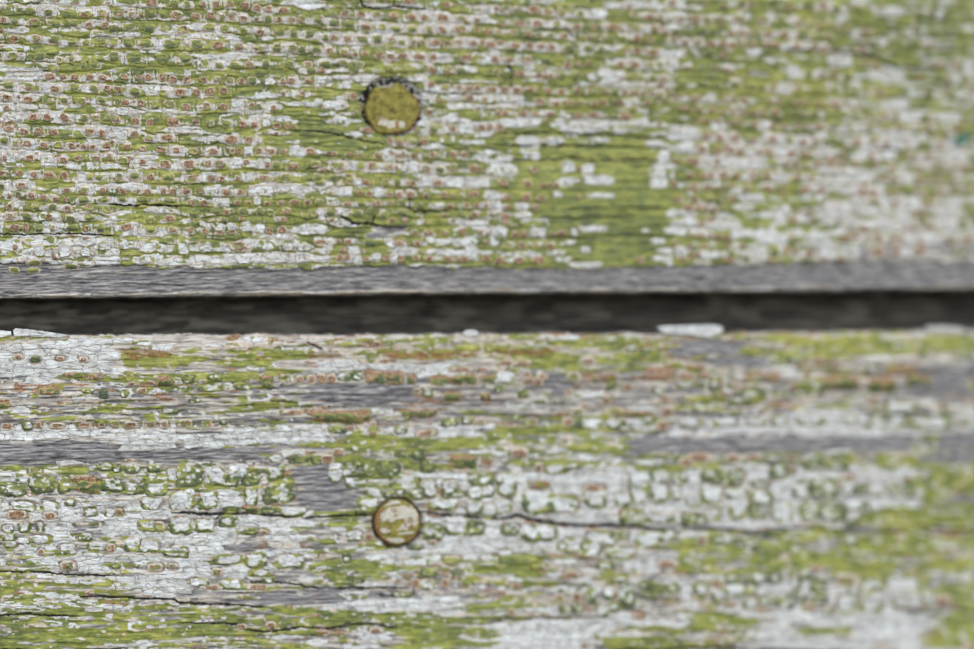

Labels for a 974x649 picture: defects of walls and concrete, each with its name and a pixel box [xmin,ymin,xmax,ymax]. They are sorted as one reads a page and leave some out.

peeling [366,225,407,238]
peeling [857,244,974,261]
peeling [0,325,974,649]
crack [419,510,974,539]
crack [0,562,415,633]